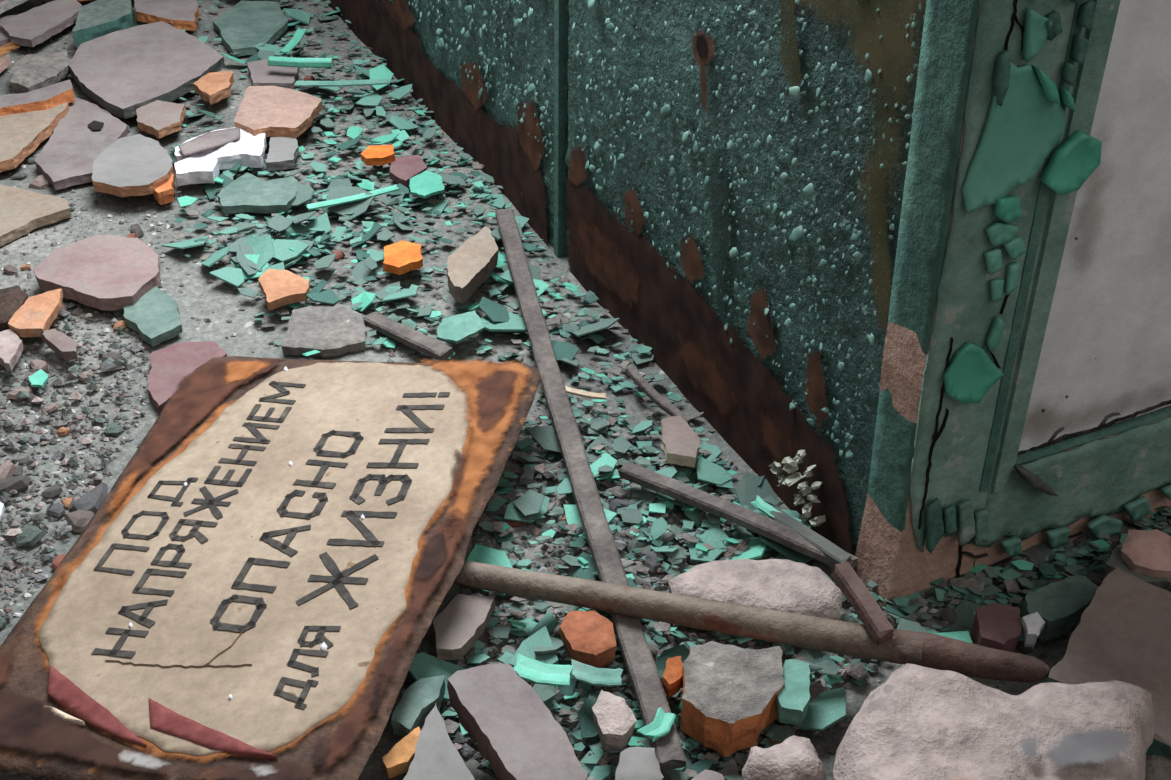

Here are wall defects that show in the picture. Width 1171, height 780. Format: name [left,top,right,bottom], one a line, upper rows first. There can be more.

corrosion [325,0,549,247]
corrosion [691,30,715,112]
peeling [572,0,919,458]
crack [1004,0,1024,51]
peeling [943,0,1102,404]
corrosion [566,146,852,554]
crack [918,337,953,530]
peeling [926,497,1022,557]
peeling [1086,496,1151,540]